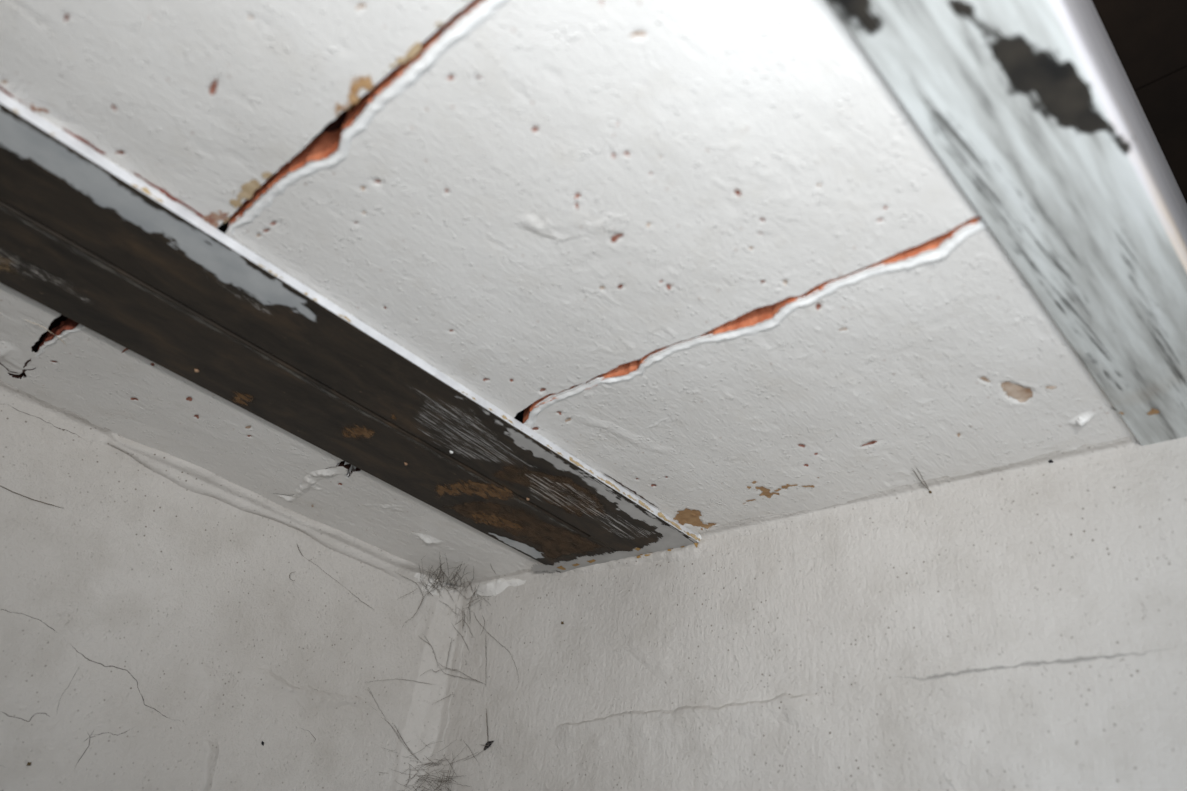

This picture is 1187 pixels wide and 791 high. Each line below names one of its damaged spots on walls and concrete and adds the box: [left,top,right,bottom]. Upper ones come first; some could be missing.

peeling [828,0,884,34]
peeling [948,0,1131,153]
peeling [203,210,229,228]
crack [0,359,36,373]
peeling [980,377,1033,402]
spalling [336,461,361,485]
peeling [489,533,544,559]
crack [0,609,180,722]